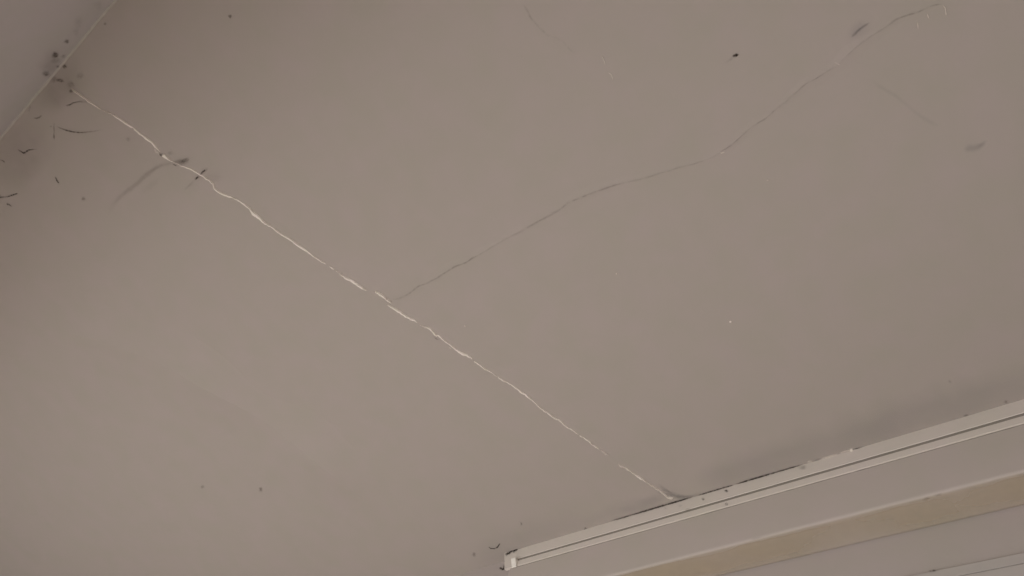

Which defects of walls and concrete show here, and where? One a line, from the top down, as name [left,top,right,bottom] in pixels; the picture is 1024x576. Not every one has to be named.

crack [72,87,796,520]